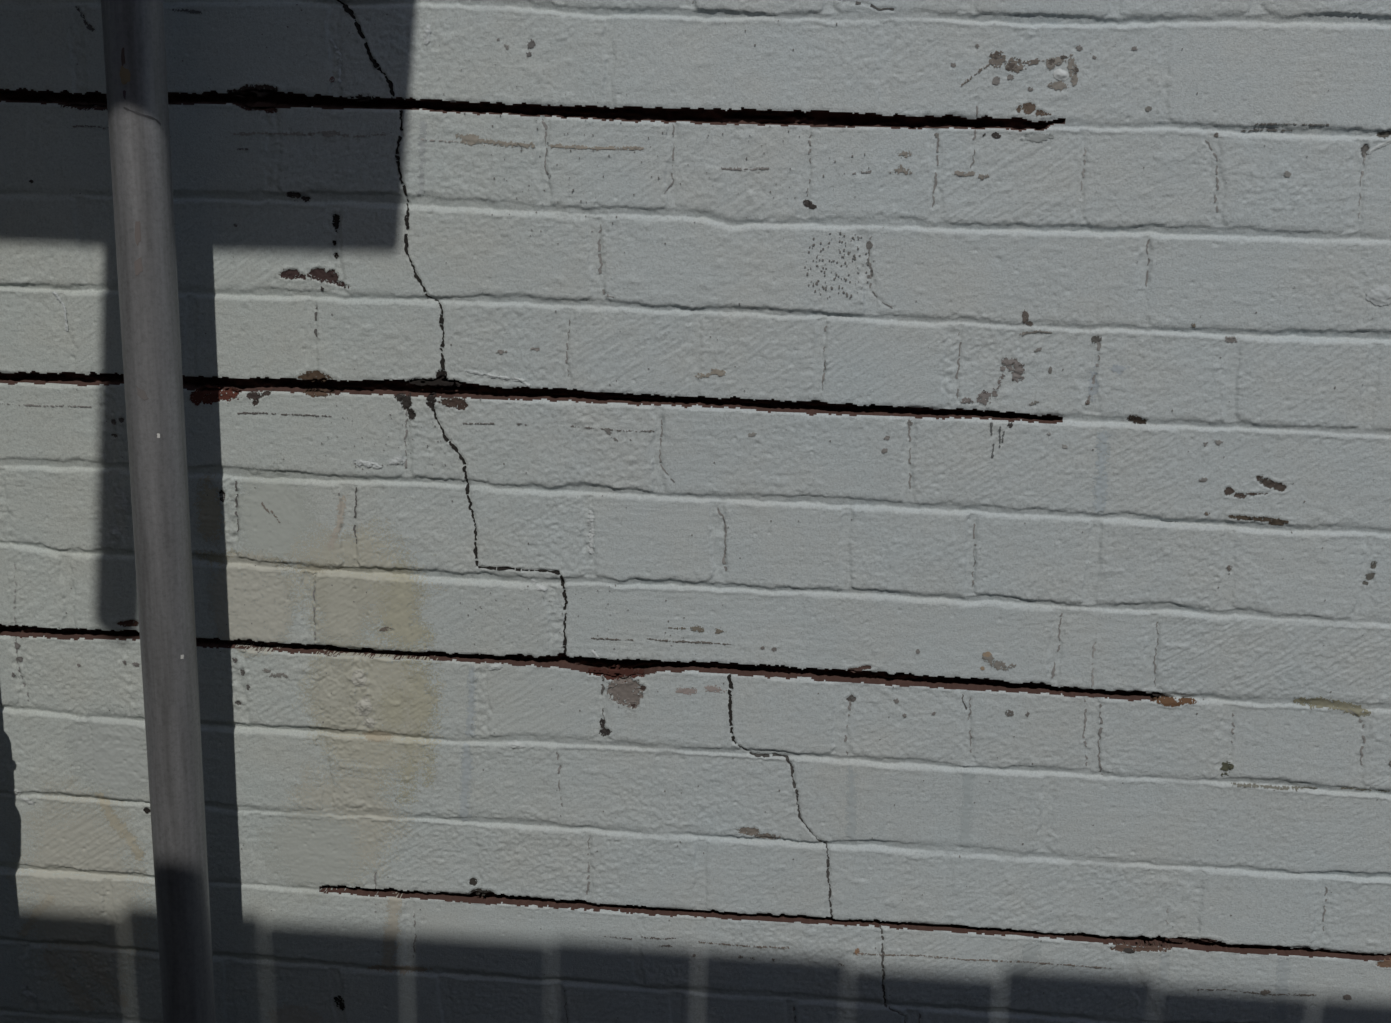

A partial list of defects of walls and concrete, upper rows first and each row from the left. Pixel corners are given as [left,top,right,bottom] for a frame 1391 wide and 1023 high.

crack [855,1,894,10]
peeling [961,44,1097,116]
crack [932,106,978,207]
crack [1205,140,1219,212]
spalling [278,214,349,291]
crack [337,0,568,655]
crack [233,481,241,532]
crack [717,508,727,571]
spalling [588,663,646,709]
crack [1051,613,1103,775]
crack [727,674,833,918]
crack [879,920,921,1023]